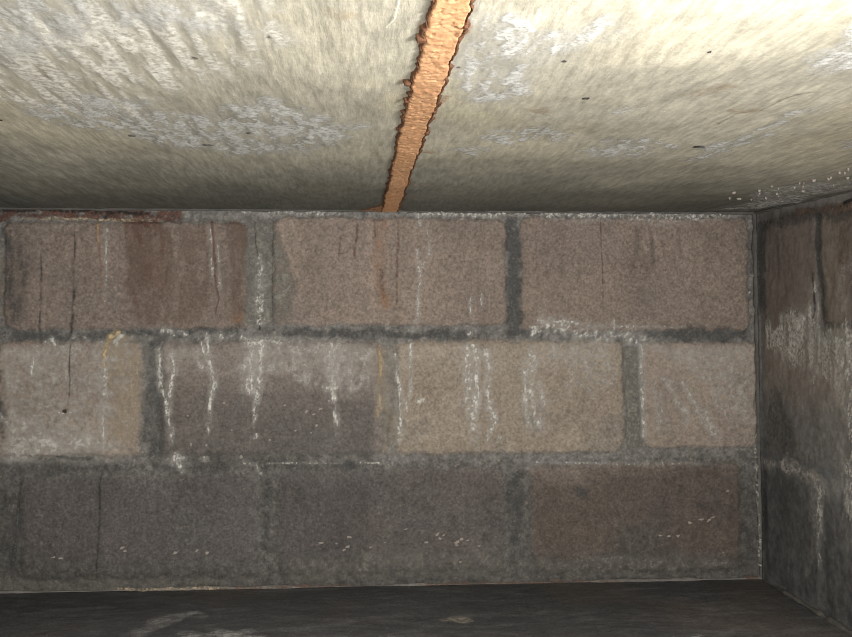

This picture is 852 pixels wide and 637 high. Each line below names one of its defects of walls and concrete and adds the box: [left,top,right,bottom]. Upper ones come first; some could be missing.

water stain [199,333,217,410]
water stain [247,339,383,420]
water stain [396,368,411,443]
water stain [465,332,497,441]
water stain [523,351,545,425]
water stain [531,183,852,520]